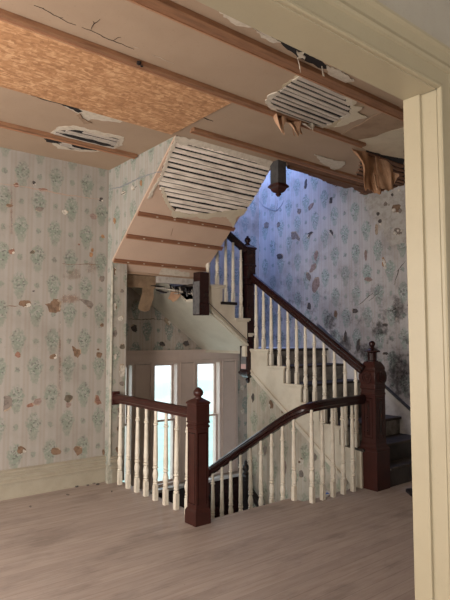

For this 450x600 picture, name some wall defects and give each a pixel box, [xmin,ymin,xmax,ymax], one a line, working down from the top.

crack [34,5,133,49]
flaking render [64,106,122,123]
peeling [219,12,407,247]
spalling [158,143,268,213]